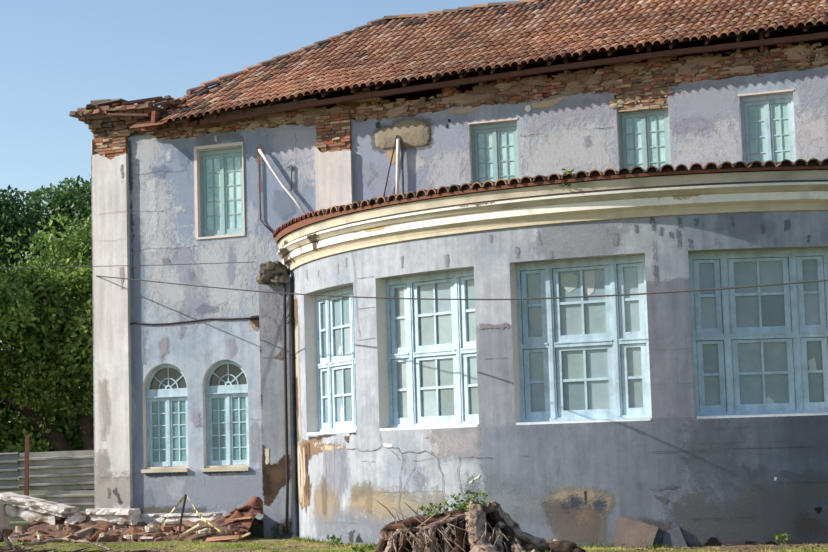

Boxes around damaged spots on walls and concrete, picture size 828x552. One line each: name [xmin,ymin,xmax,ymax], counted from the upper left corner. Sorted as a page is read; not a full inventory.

flaking render [315,110,352,153]
peeling [524,95,566,112]
flaking render [615,77,668,113]
spalling [261,290,356,513]
crack [351,430,491,509]
leakage [426,422,615,547]